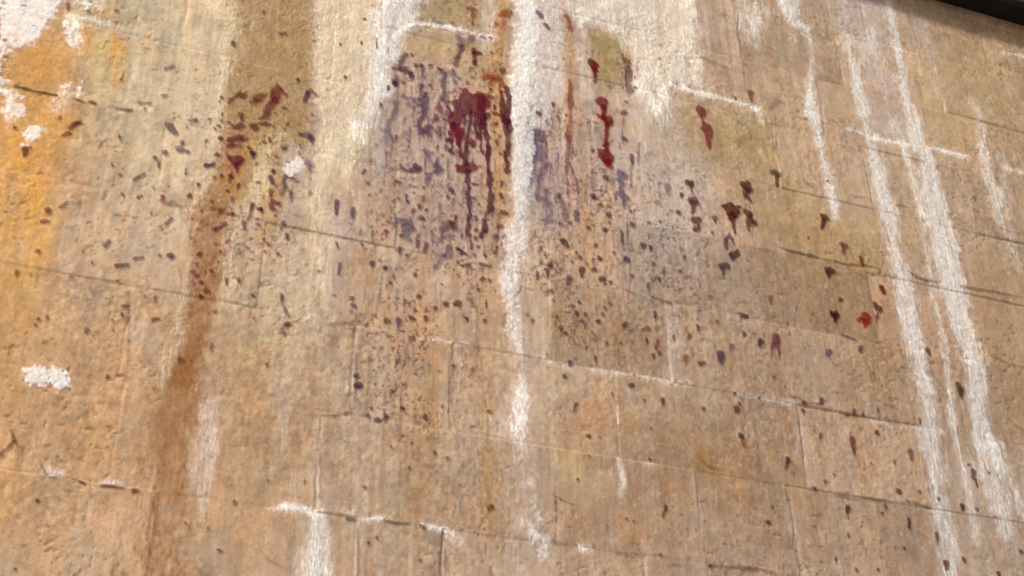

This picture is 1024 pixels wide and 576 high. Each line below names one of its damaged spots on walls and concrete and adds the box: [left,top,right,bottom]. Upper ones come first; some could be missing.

leakage [820,180,837,229]
leakage [140,0,757,502]
leakage [856,285,886,327]